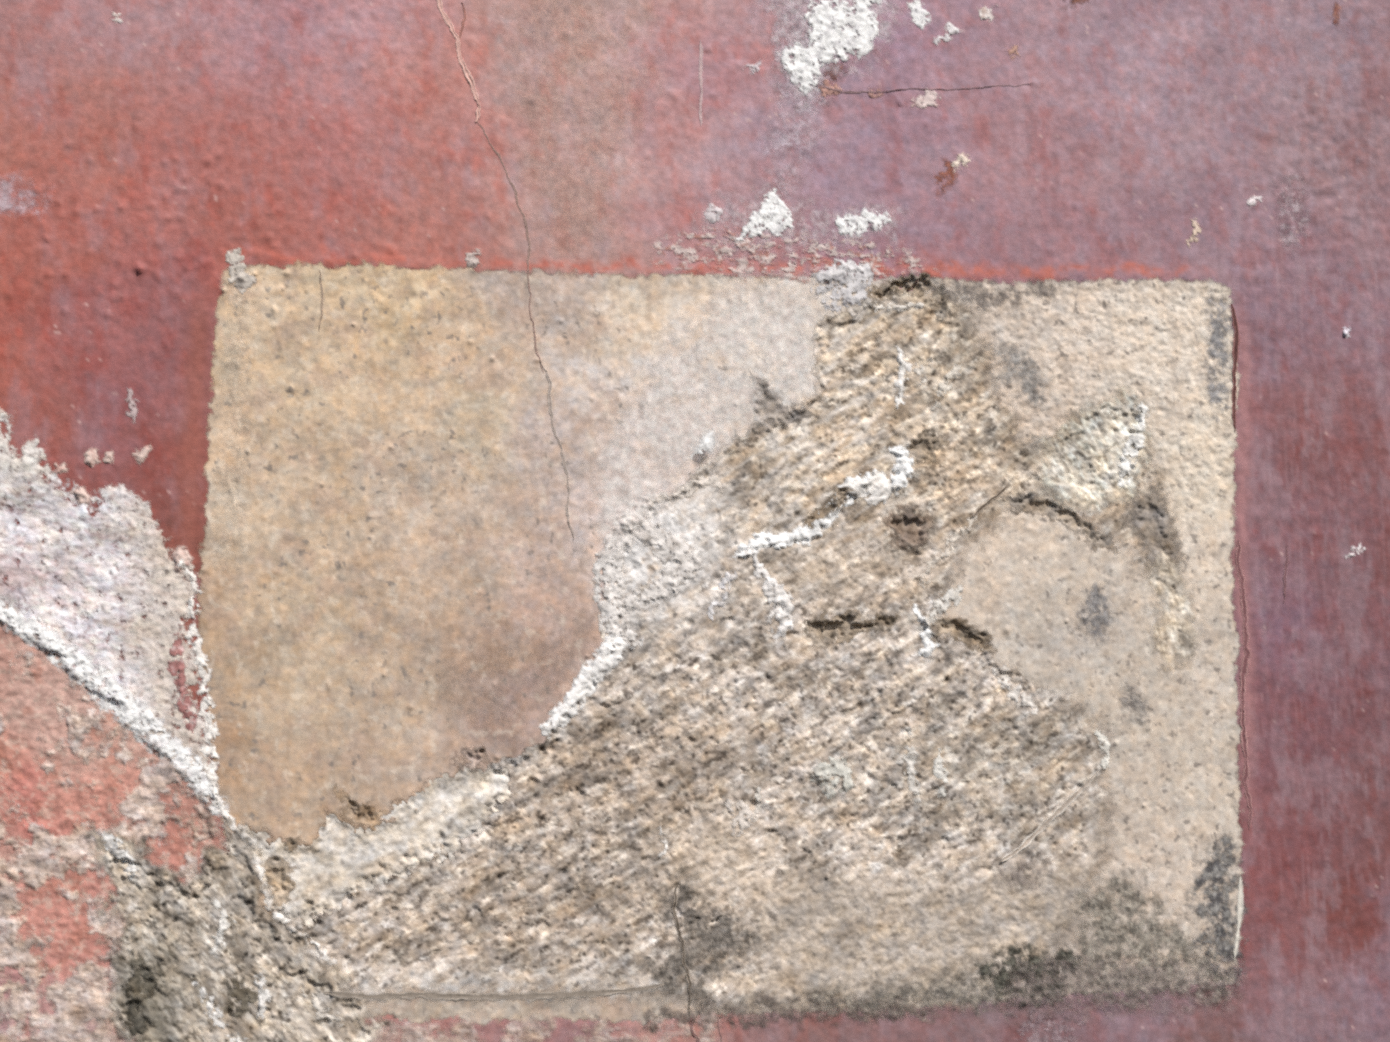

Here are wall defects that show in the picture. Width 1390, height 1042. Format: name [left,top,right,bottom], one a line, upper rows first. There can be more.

peeling [781,0,881,96]
peeling [908,0,959,45]
peeling [911,89,941,108]
peeling [952,153,971,171]
peeling [226,248,257,294]
crack [438,0,574,537]
peeling [126,388,138,422]
spalling [243,188,1196,1018]
peeling [0,621,226,1042]
peeling [211,899,236,955]
peeling [192,981,247,1042]
peeling [301,990,344,1027]